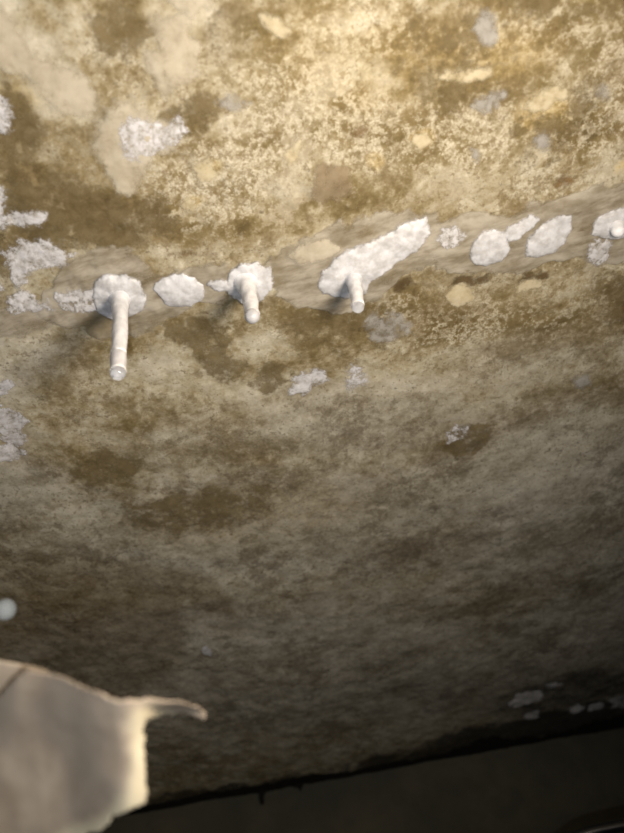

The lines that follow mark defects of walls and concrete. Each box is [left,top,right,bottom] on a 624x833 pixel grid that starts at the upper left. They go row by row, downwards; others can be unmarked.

water stain [0,83,247,380]
water stain [248,361,327,395]
water stain [0,380,31,462]
water stain [508,682,562,720]
water stain [569,697,624,714]